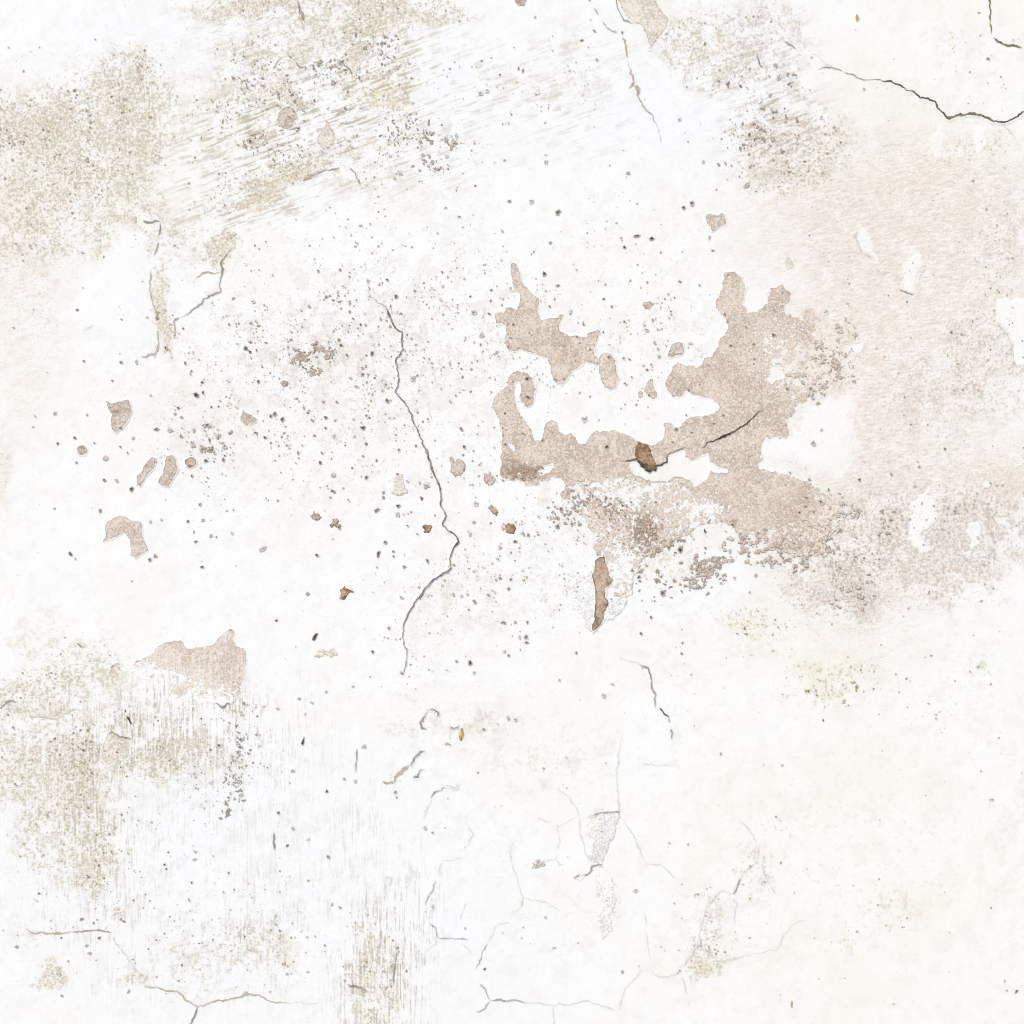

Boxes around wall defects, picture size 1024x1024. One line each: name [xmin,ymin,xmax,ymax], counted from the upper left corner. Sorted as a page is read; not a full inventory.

crack [589,0,652,114]
crack [823,66,1024,126]
crack [989,0,1020,47]
peeling [471,251,632,392]
peeling [103,398,134,454]
peeling [98,509,162,562]
peeling [129,407,284,492]
crack [367,295,459,670]
peeling [483,270,865,634]
peeling [108,627,280,819]